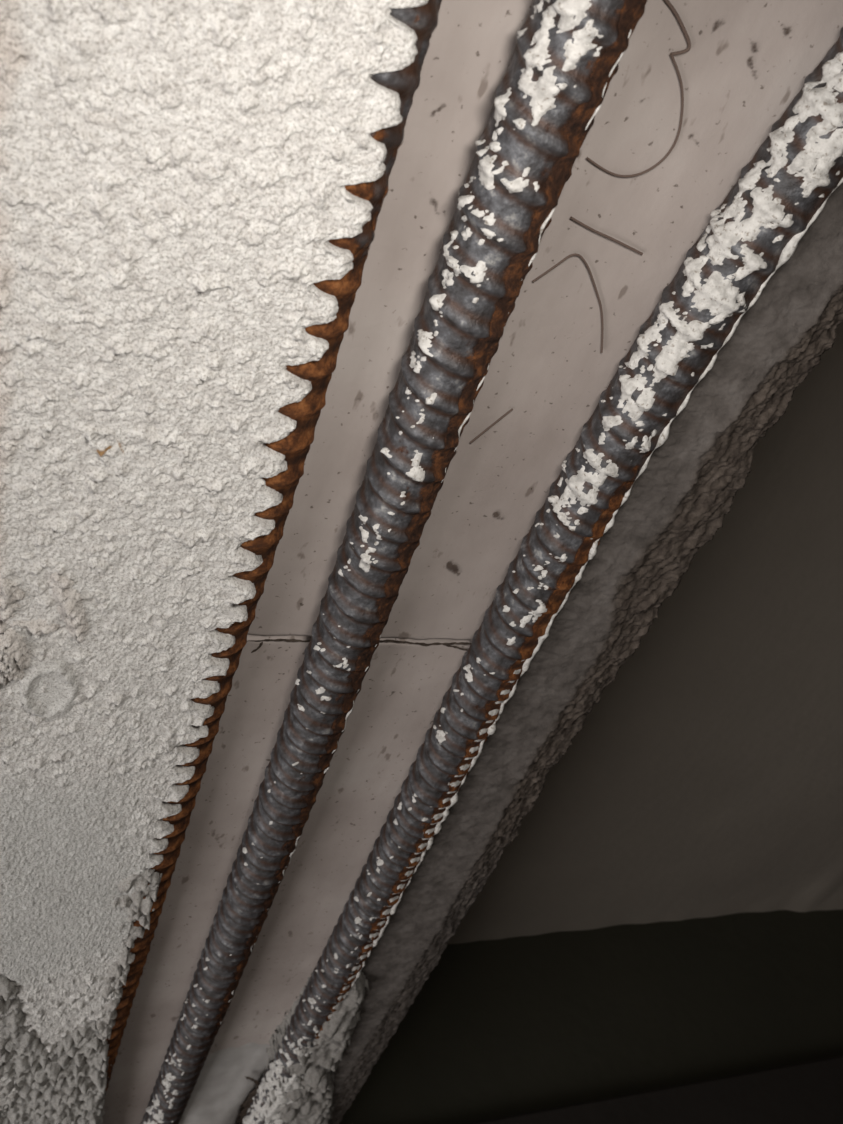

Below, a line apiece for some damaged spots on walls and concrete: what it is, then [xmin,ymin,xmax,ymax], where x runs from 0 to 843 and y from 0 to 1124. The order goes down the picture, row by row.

rust [102,182,388,1102]
crack [249,639,310,653]
spalling [0,0,603,1124]
rust [197,0,647,1069]
crack [379,639,471,651]
spalling [208,0,843,1124]